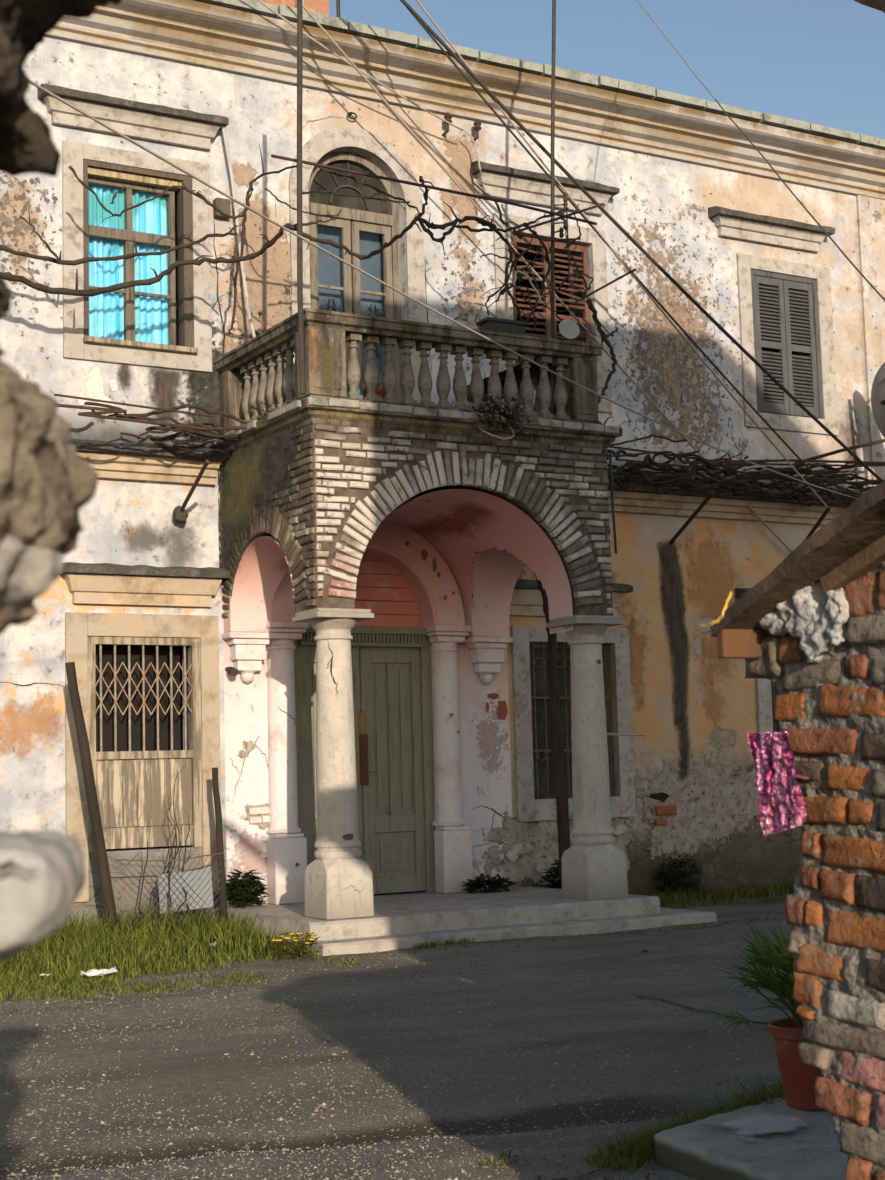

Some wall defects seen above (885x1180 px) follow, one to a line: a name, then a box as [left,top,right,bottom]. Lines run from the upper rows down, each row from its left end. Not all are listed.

flaking render [439,135,484,309]
flaking render [611,184,748,468]
peeling [472,693,509,780]
flaking render [481,806,573,885]
leakage [658,542,690,780]
flaking render [611,728,759,871]